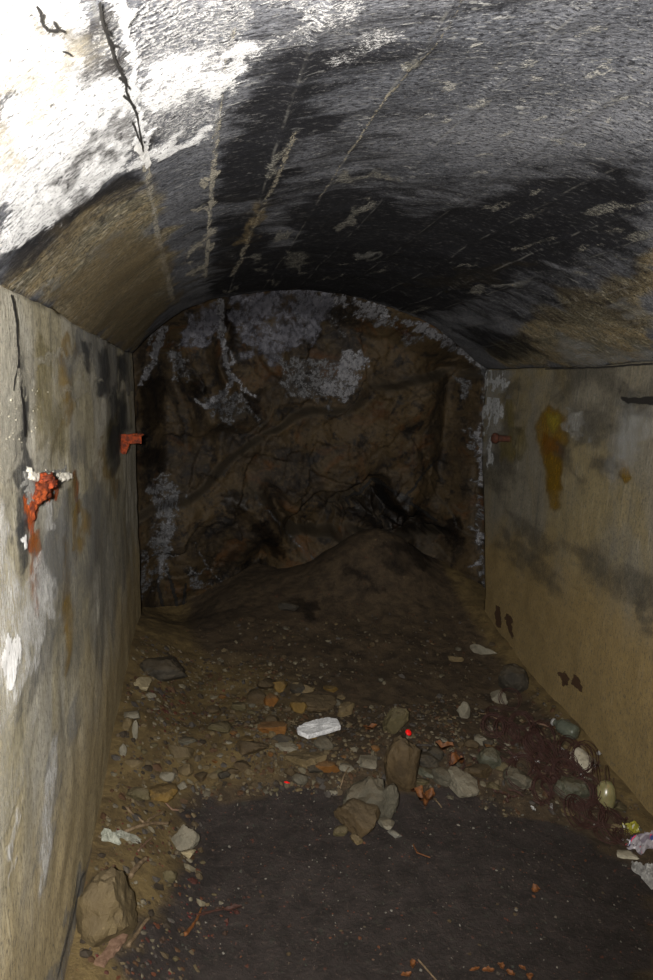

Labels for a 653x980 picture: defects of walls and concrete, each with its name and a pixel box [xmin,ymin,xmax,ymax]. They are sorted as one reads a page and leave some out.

crack [36,5,72,57]
crack [98,2,144,152]
crack [11,295,26,437]
leakage [0,0,510,601]
corrosion [536,406,568,509]
corrosion [23,482,58,614]